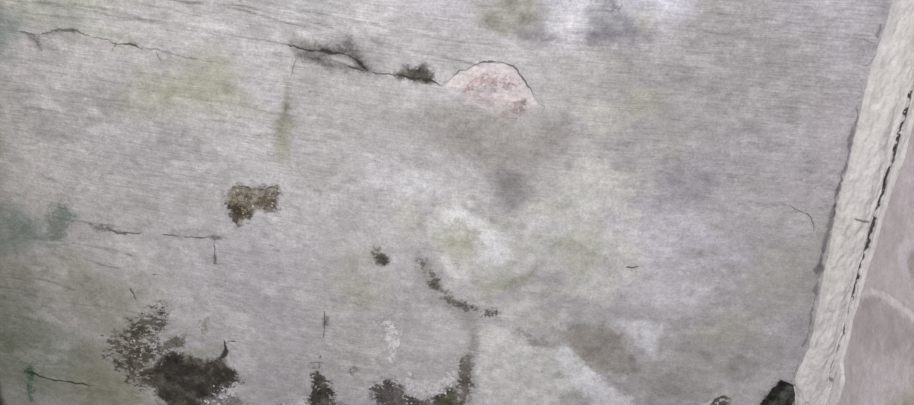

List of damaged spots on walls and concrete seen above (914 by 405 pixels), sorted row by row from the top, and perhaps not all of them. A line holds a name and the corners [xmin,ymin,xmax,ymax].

crack [22,26,142,53]
crack [284,30,442,88]
crack [88,222,140,237]
crack [163,233,227,266]
spalling [218,180,283,230]
water stain [342,106,770,405]
crack [826,86,914,404]
water stain [59,298,264,405]
water stain [275,356,348,405]